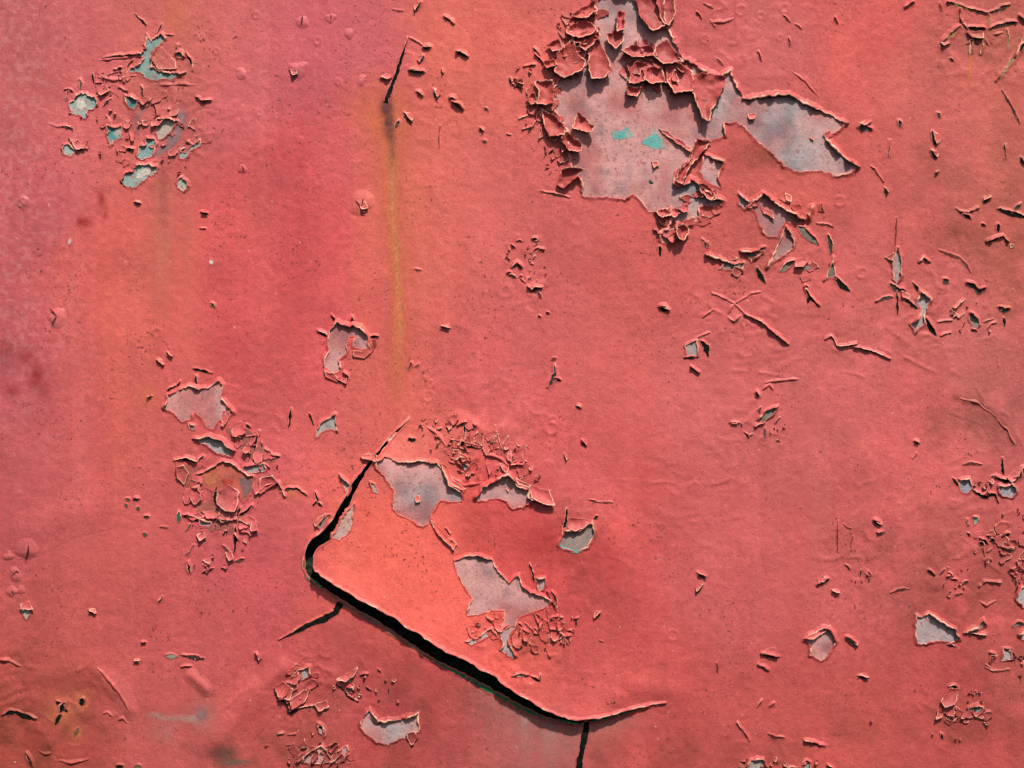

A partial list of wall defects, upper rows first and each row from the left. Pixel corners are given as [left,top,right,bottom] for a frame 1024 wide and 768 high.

peeling [47,12,213,206]
corrosion [378,101,403,353]
crack [380,35,423,104]
peeling [505,0,890,293]
peeling [874,216,1012,338]
peeling [123,366,289,576]
crack [286,406,294,429]
peeling [313,472,357,542]
crack [275,415,667,768]
peeling [361,412,600,683]
peeling [911,456,1024,676]
peeling [333,667,423,749]